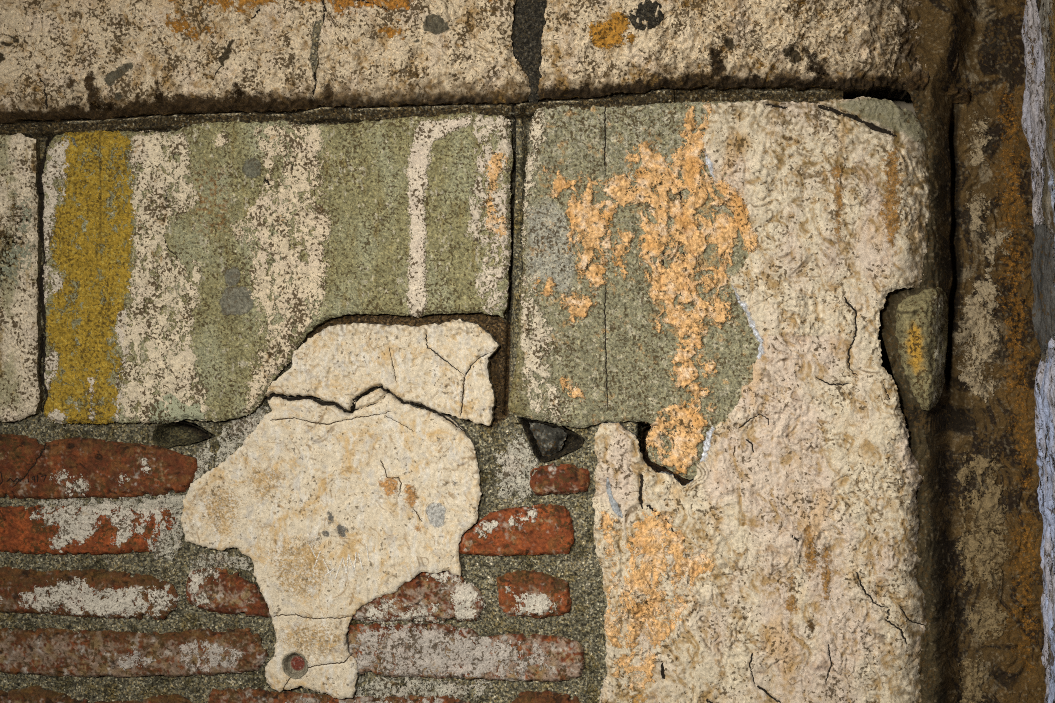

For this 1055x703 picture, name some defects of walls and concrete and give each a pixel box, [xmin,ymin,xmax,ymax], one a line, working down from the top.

crack [818,105,897,137]
crack [816,297,858,385]
crack [265,334,488,432]
crack [733,414,769,456]
crack [856,572,924,644]
crack [749,653,781,703]